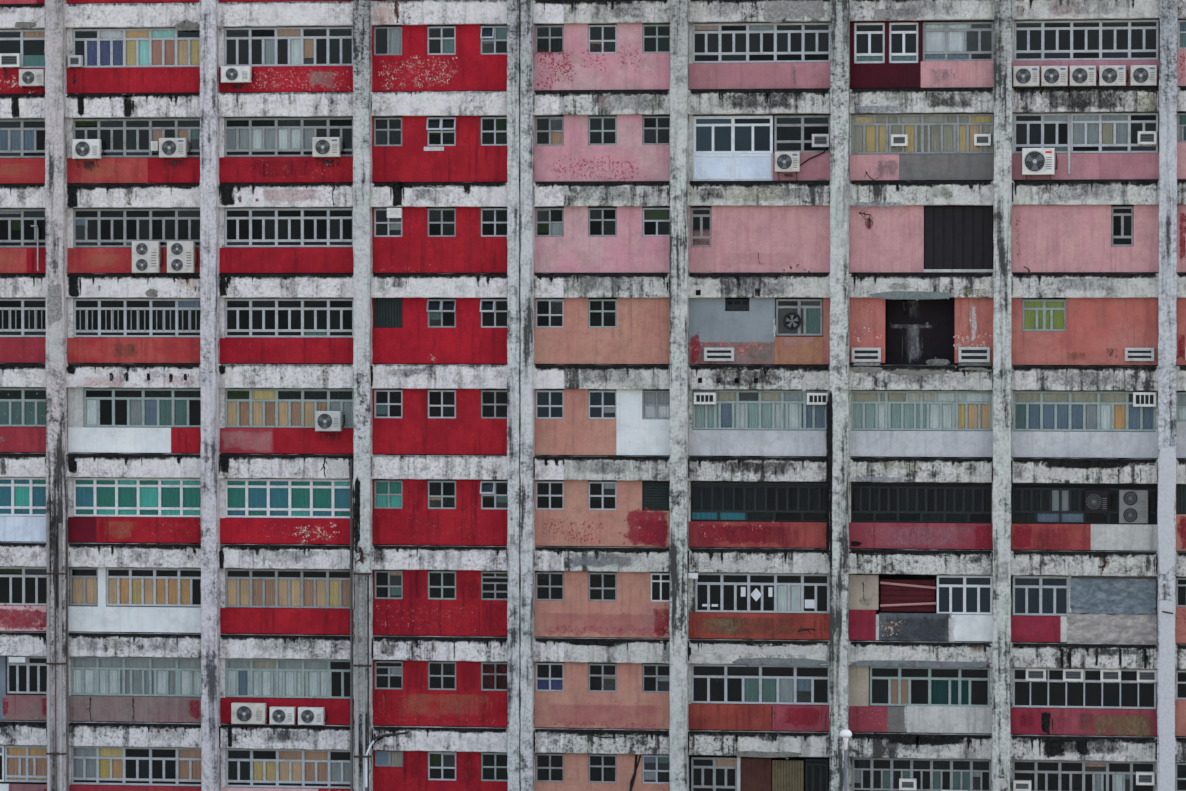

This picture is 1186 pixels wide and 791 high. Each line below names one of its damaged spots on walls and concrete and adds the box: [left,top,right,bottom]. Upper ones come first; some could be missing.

peeling [252,68,351,92]
peeling [378,54,458,91]
peeling [534,42,646,89]
damp [0,184,45,198]
damp [850,458,993,482]
peeling [263,522,340,544]
damp [848,541,993,572]
peeling [0,603,47,632]
damp [1011,712,1157,760]